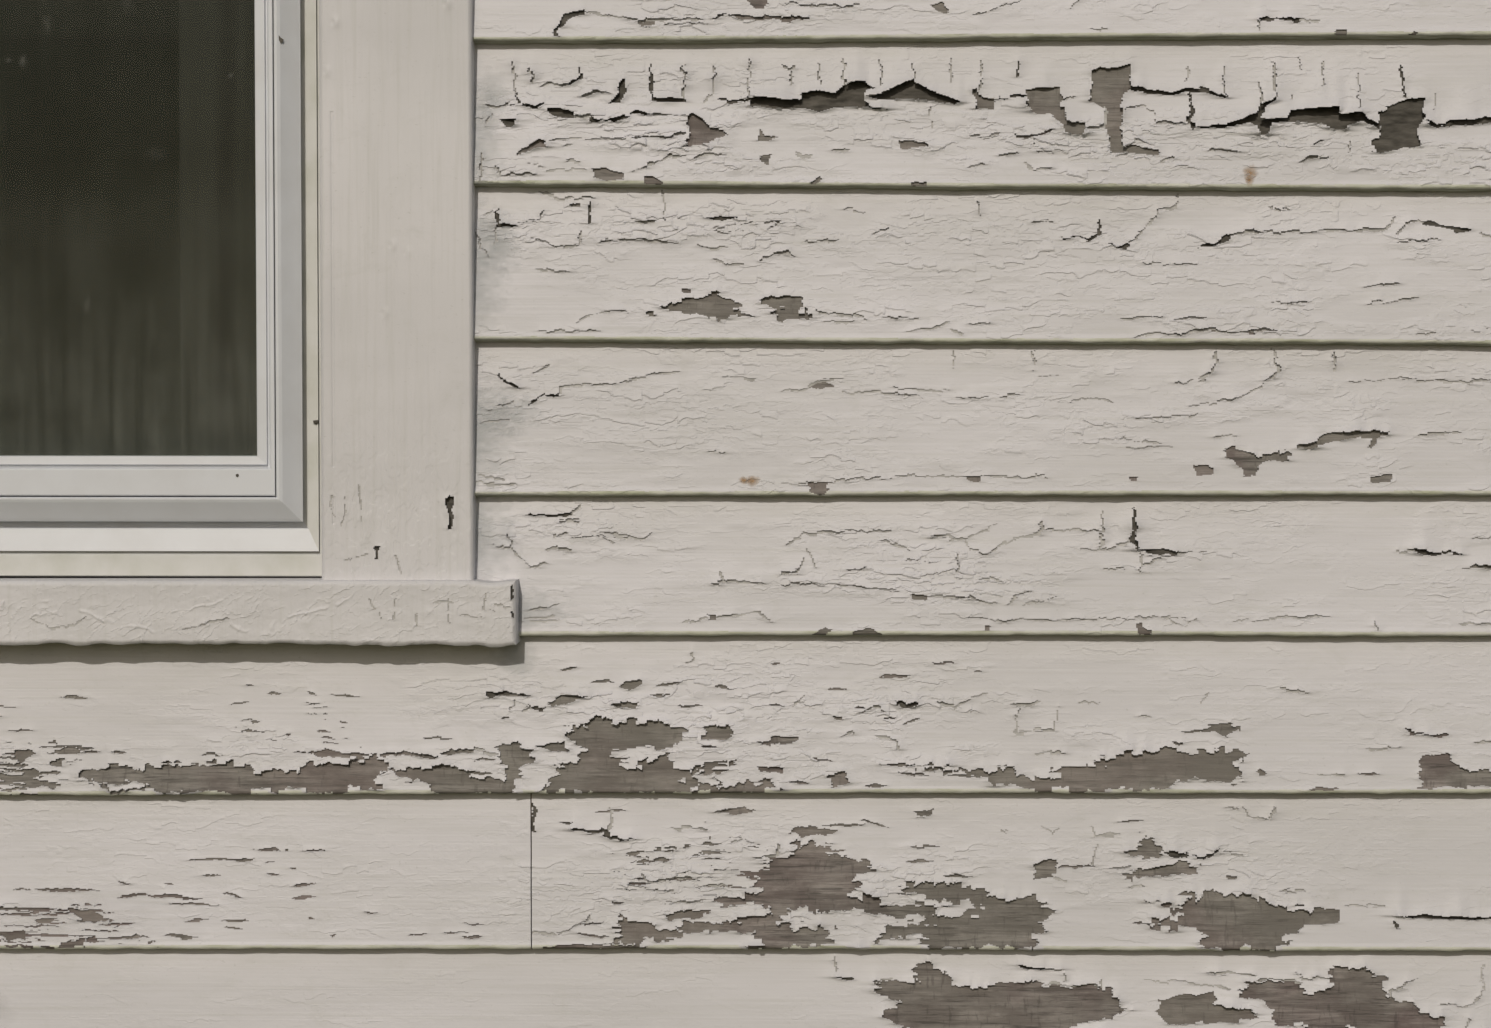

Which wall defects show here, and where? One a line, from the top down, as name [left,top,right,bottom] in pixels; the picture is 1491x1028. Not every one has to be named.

crack [785,0,860,8]
crack [1257,16,1320,31]
peeling [475,50,1435,257]
crack [599,190,889,266]
crack [1031,194,1491,266]
peeling [643,283,819,323]
crack [1364,282,1436,336]
crack [480,310,680,424]
crack [722,301,1307,444]
peeling [1193,408,1396,477]
crack [711,507,1206,592]
peeling [0,663,1491,1028]